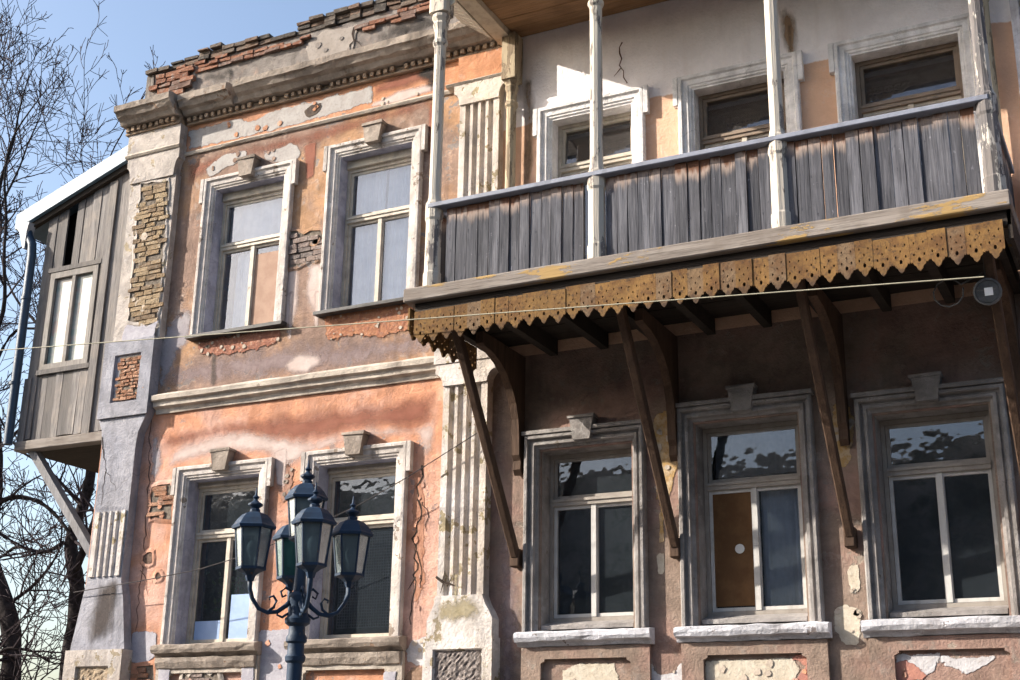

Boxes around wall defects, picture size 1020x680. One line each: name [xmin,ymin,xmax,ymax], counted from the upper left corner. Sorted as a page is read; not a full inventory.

flaking render [148,34,328,95]
crack [614,42,628,83]
flaking render [127,177,171,327]
flaking render [288,226,323,273]
flaking render [113,355,144,401]
flaking render [146,479,174,524]
crack [408,465,455,625]
flaking render [847,565,860,594]
flaking render [834,604,862,645]
flaking render [562,663,619,680]
flaking render [705,654,808,680]
flaking render [895,653,999,680]